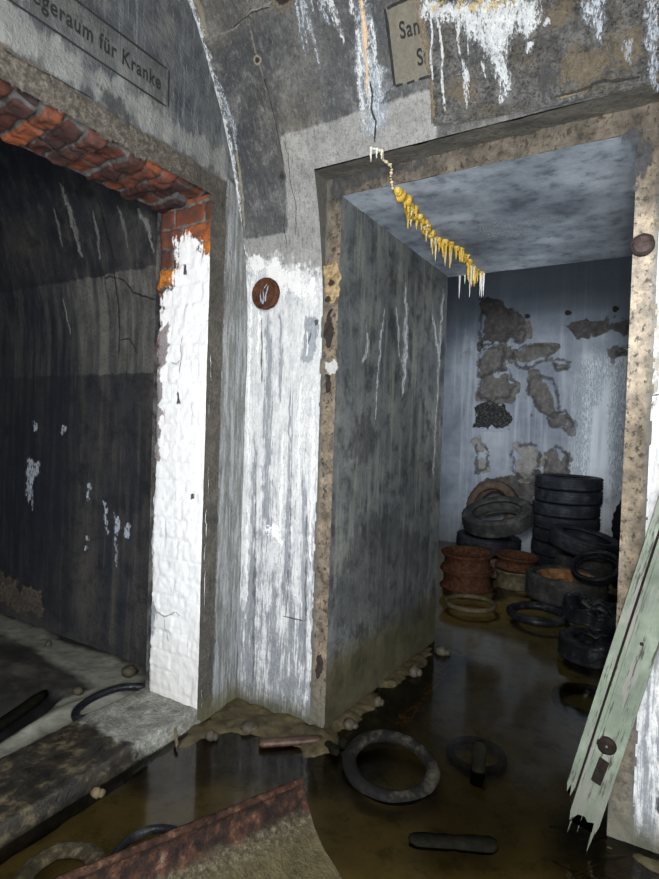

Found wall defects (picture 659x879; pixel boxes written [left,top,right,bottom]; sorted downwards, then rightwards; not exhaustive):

crack [203,0,272,43]
efflorescence [295,0,388,142]
damp [411,0,550,108]
efflorescence [581,0,605,41]
damp [643,0,659,91]
flaking render [565,306,629,340]
flaking render [607,345,628,364]
flaking render [471,297,577,504]
damp [247,314,291,681]